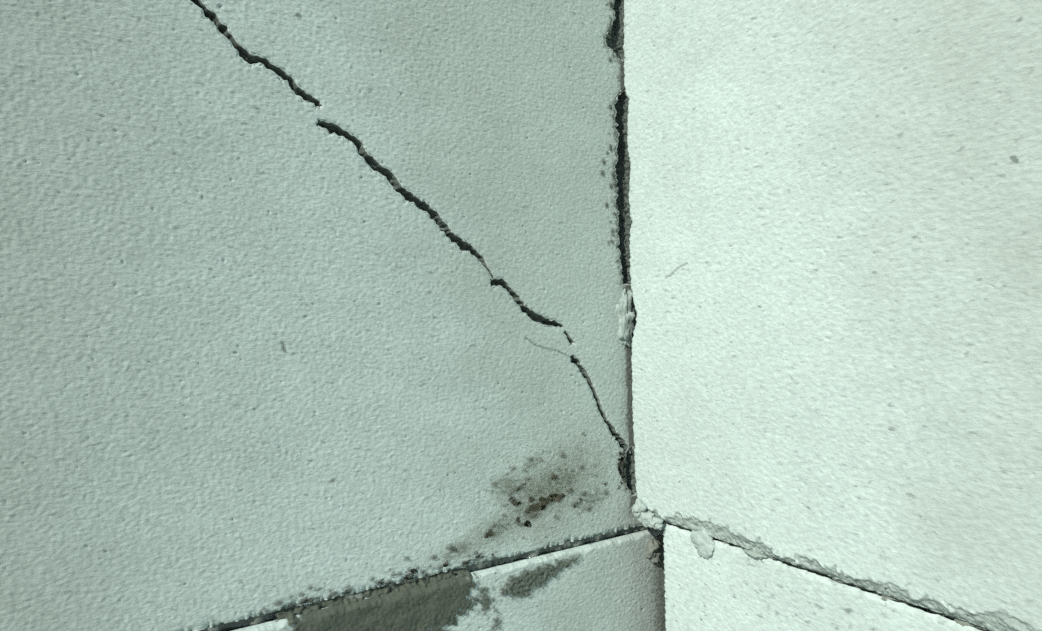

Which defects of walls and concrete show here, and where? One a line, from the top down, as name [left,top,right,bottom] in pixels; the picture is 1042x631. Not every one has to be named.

crack [188,0,631,454]
leakage [487,454,608,539]